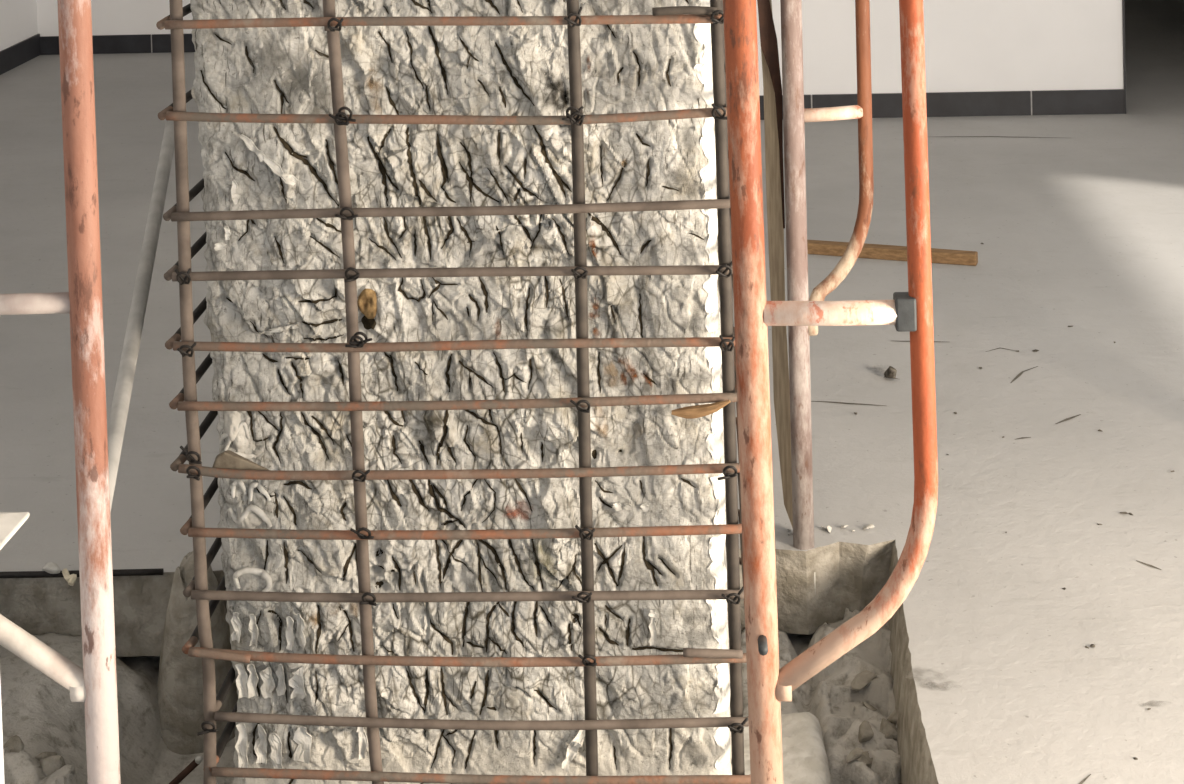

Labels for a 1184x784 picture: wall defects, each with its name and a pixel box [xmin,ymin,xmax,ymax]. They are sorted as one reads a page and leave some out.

crack [200,70,226,109]
spalling [693,23,718,332]
crack [215,0,683,784]
rust [606,361,652,386]
spalling [702,347,722,391]
spalling [706,409,723,460]
spalling [706,473,727,645]
flaking render [235,663,306,700]
spalling [713,663,730,714]
flaking render [235,723,312,769]
flaking render [561,730,585,772]
spalling [713,727,731,775]